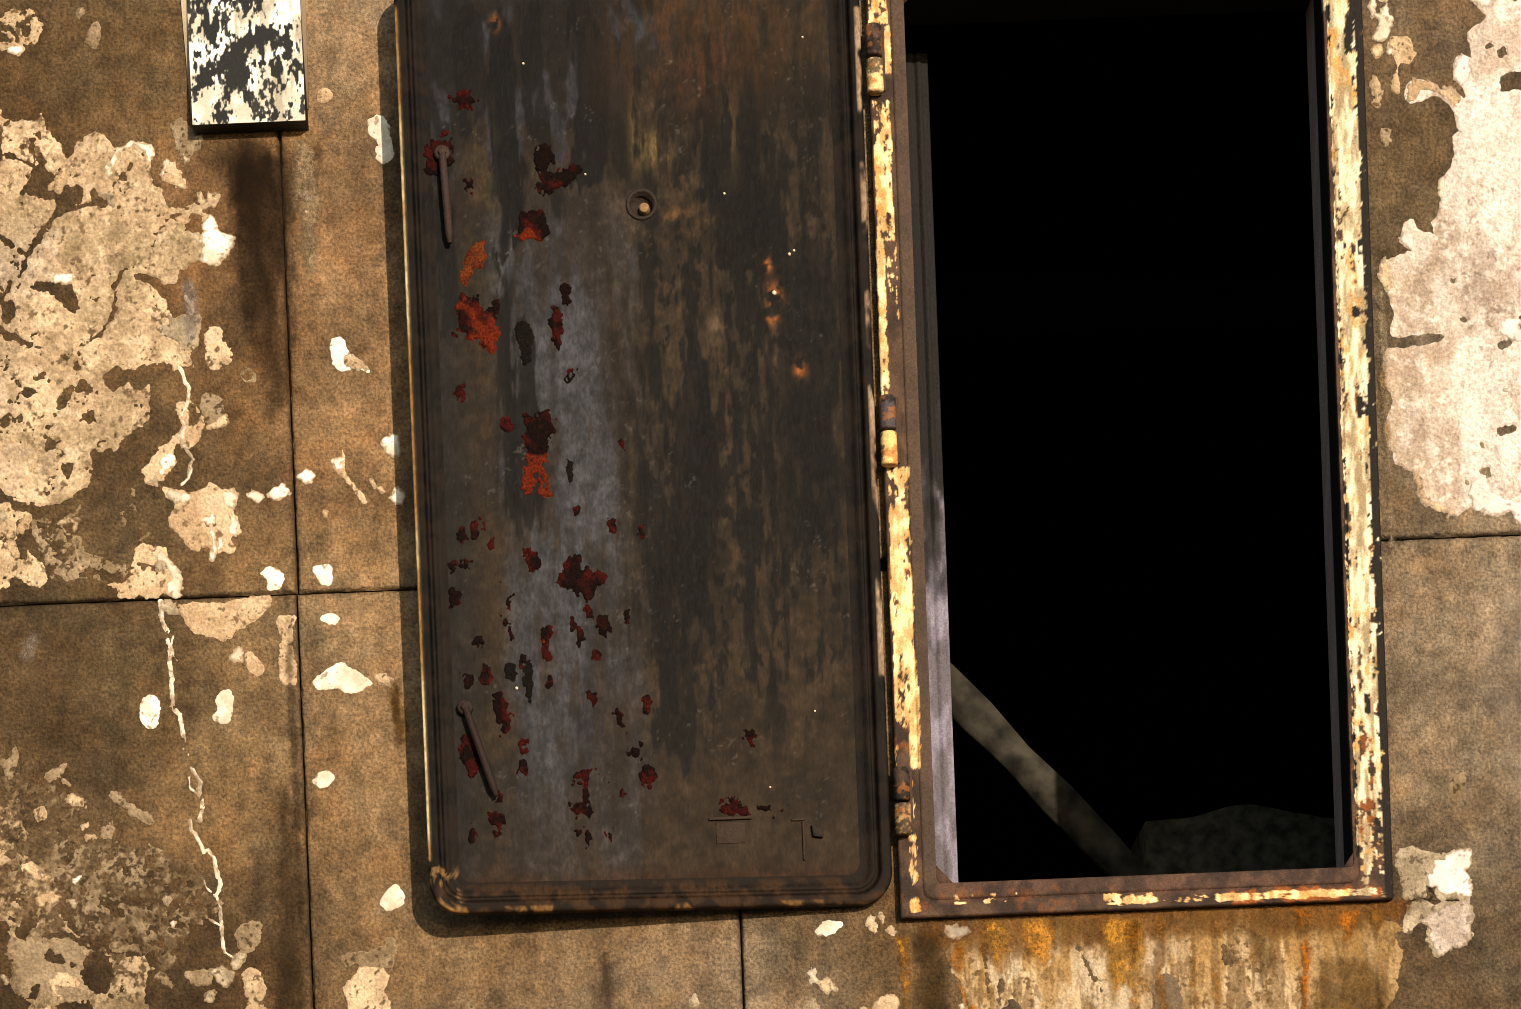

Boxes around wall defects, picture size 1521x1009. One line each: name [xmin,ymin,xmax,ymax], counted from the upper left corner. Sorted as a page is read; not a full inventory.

peeling [0,8,44,56]
crack [177,295,195,486]
peeling [0,109,406,694]
corrosion [451,240,501,355]
corrosion [513,143,583,242]
corrosion [547,279,572,351]
peeling [1367,0,1521,524]
corrosion [498,554,630,689]
crack [158,599,233,958]
corrosion [458,636,530,779]
peeling [0,744,267,1009]
peeling [944,845,1475,1009]